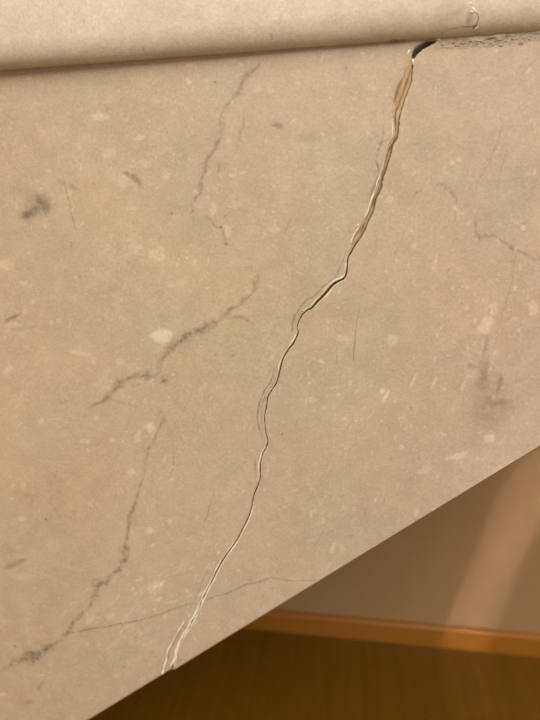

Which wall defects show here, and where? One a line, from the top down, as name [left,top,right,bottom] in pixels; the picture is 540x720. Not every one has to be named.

crack [161,58,415,674]